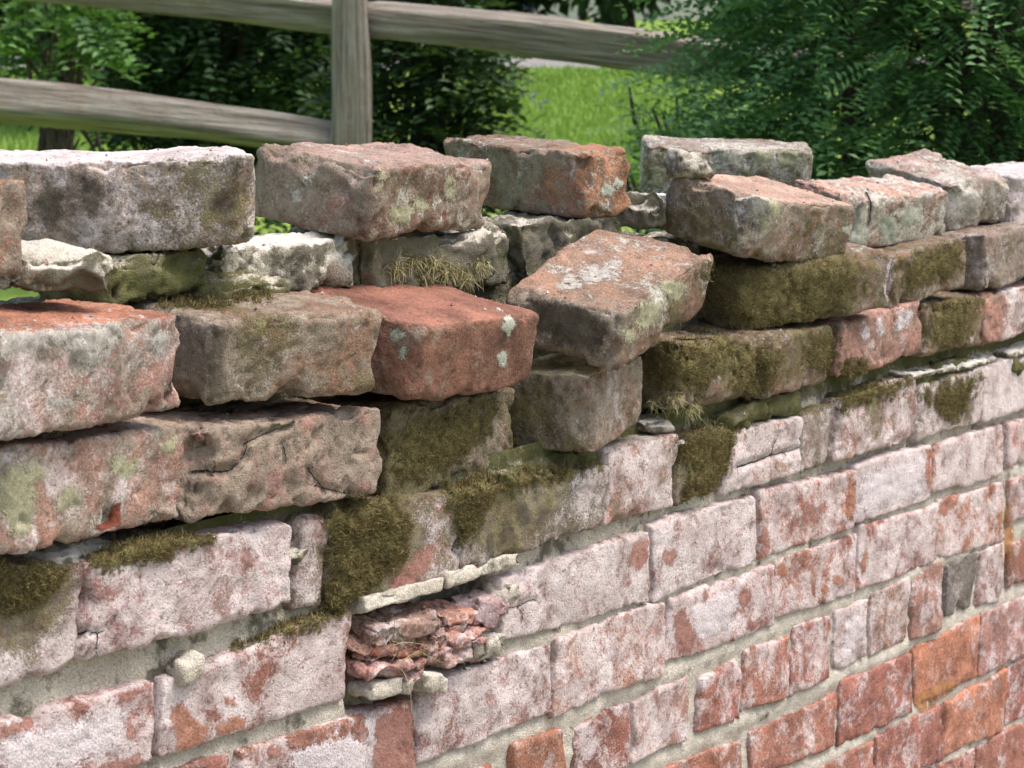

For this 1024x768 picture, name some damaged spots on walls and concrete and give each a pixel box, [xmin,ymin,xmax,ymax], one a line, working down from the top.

crack [191,424,350,494]
spalling [345,581,520,700]